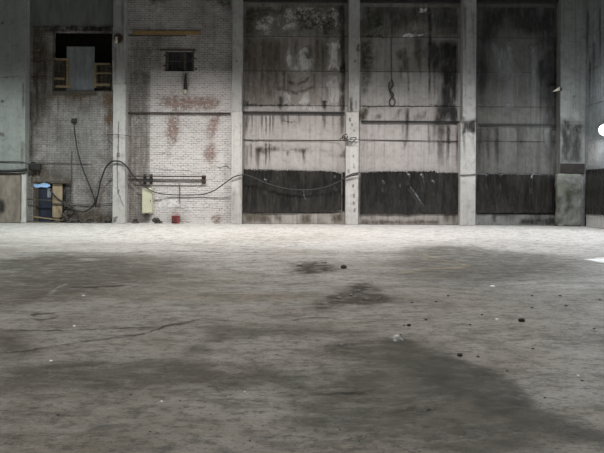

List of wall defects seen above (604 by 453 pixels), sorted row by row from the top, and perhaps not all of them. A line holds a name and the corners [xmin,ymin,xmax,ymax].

damp [439,126,458,149]
crack [61,317,207,347]